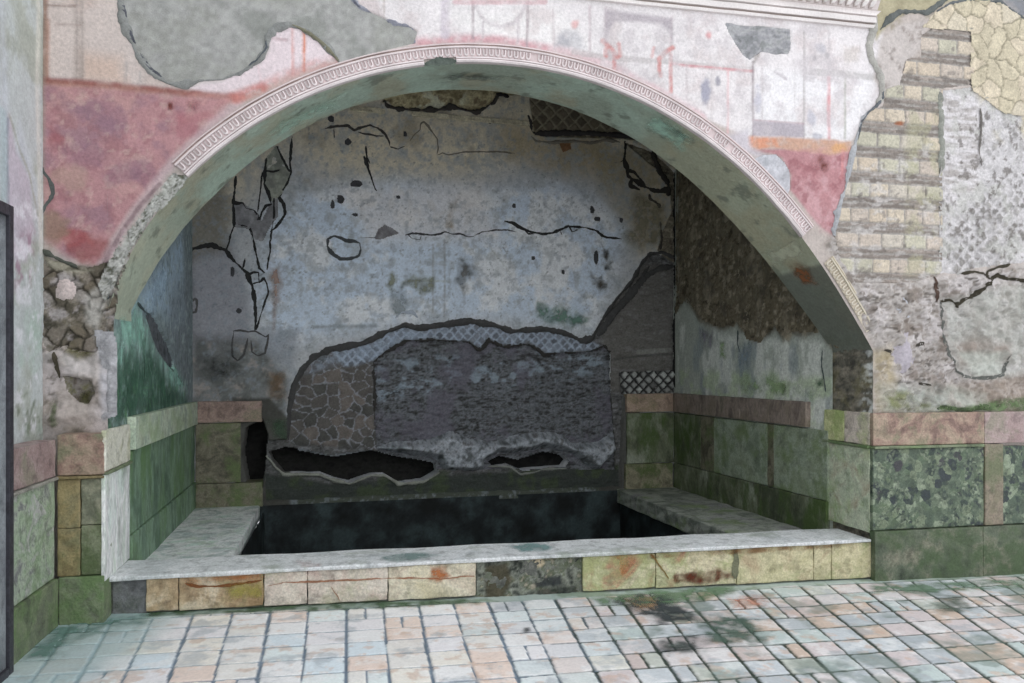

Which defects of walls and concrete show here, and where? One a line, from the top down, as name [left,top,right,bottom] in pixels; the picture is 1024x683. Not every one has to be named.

spalling [117,0,417,90]
crack [325,121,515,191]
spalling [383,90,516,124]
flaking render [831,0,1024,284]
crack [192,138,293,361]
crack [406,221,621,240]
spalling [245,97,818,500]
crack [621,141,675,387]
crack [916,263,1024,412]
spalling [63,376,95,404]
rust [674,570,730,584]